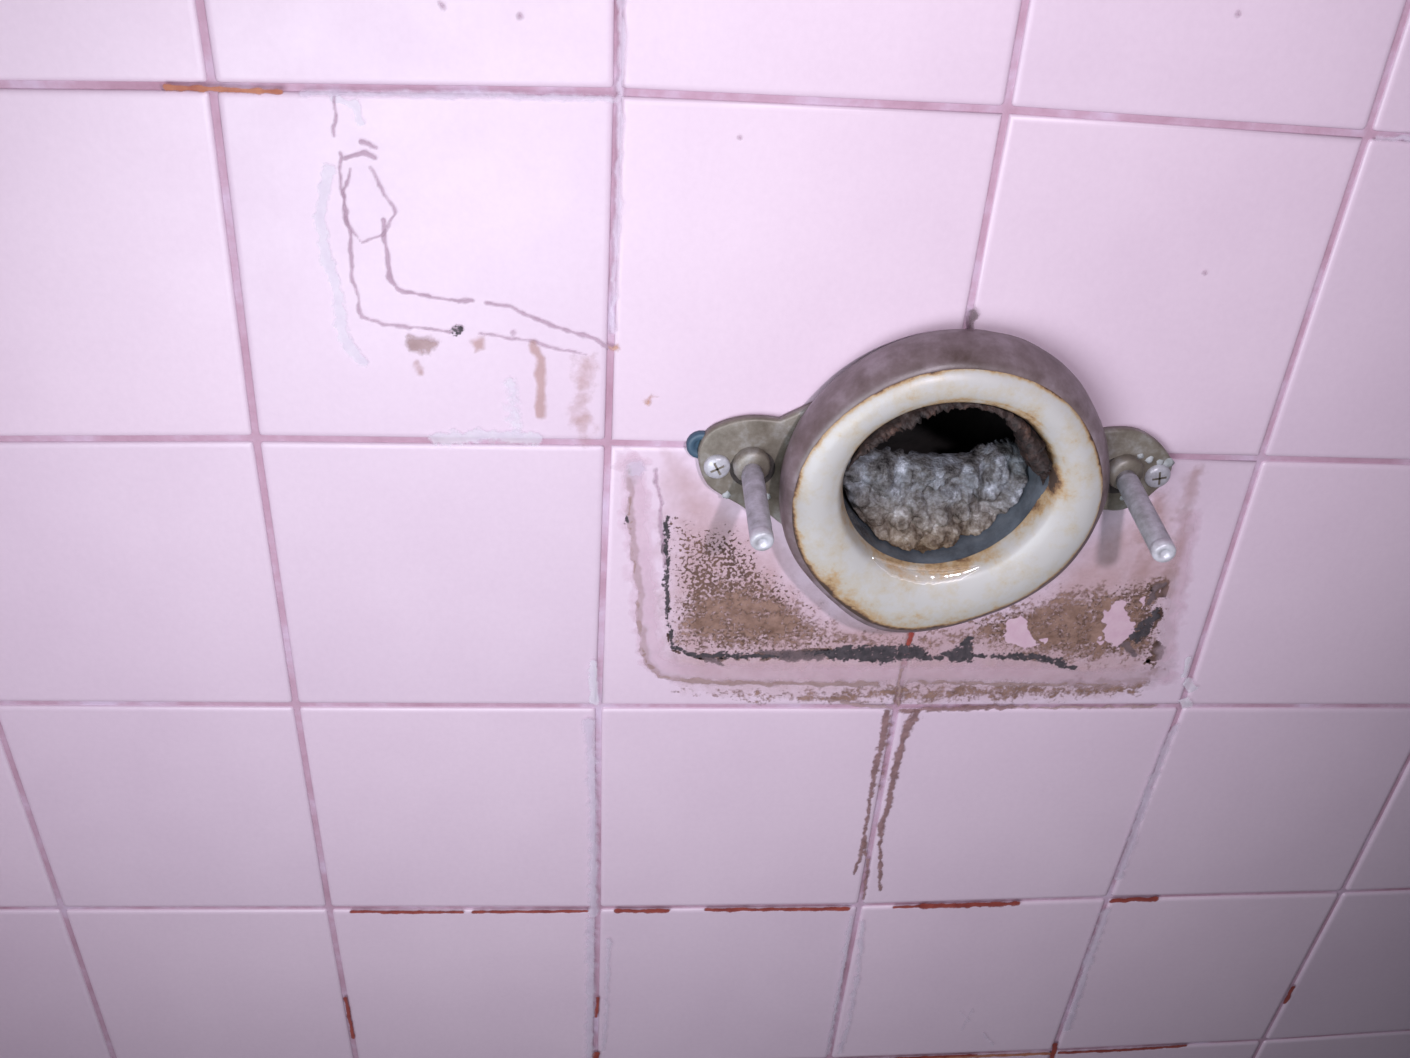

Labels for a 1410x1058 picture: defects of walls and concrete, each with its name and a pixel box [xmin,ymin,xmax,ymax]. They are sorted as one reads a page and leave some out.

rust [163,84,283,95]
leakage [661,516,1078,670]
peeling [1003,614,1048,649]
peeling [1097,596,1145,650]
leakage [1118,582,1167,657]
leakage [825,699,1157,714]
crack [853,632,920,900]
rust [893,901,1020,909]
rust [343,997,355,1039]
rust [896,1043,1187,1058]